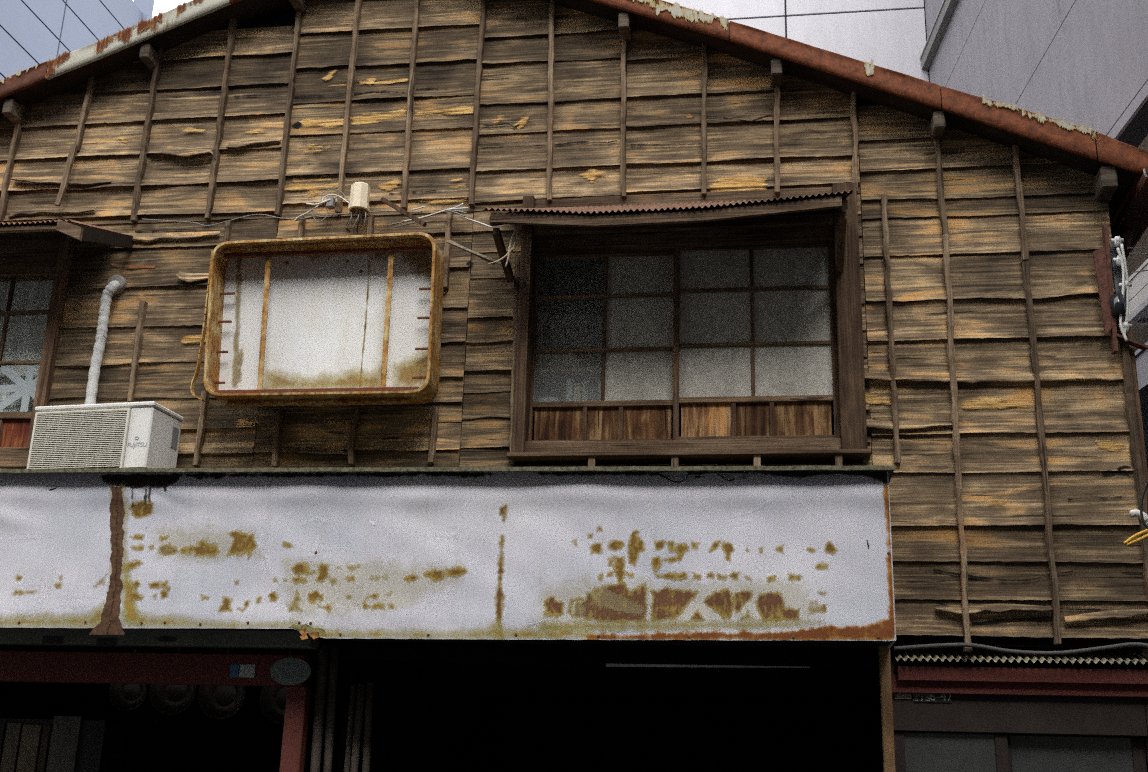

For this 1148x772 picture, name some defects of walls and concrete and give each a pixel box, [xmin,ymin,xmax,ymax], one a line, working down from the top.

rust [92,12,162,53]
peeling [633,0,728,30]
rust [45,51,70,77]
rust [407,247,432,279]
rust [233,258,243,386]
rust [267,253,387,389]
rust [397,354,428,387]
rust [122,485,895,640]